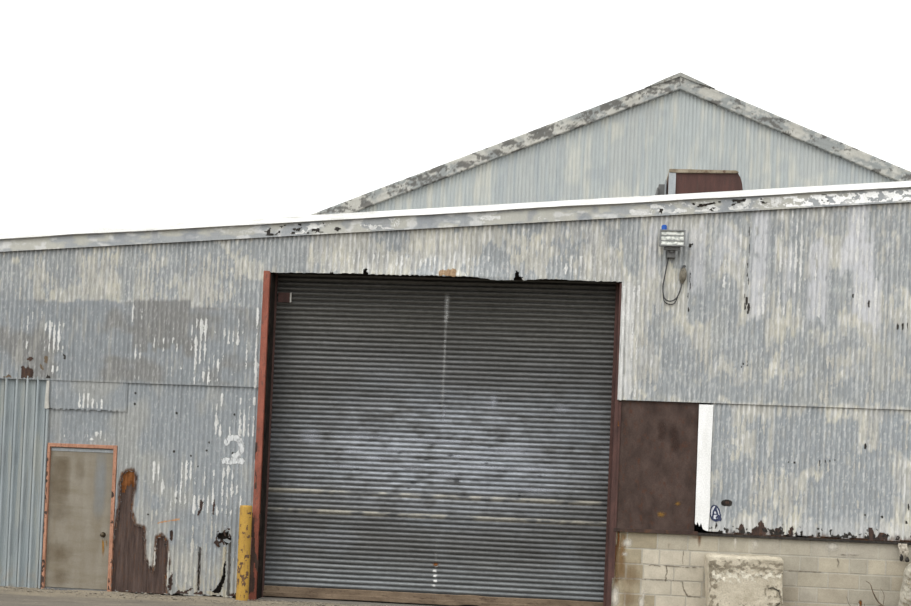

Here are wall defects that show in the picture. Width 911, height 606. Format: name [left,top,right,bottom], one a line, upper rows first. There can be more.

peeling [290,223,331,234]
peeling [625,190,911,406]
rust [6,356,50,378]
rust [102,468,211,595]
rust [738,520,794,537]
rust [868,528,888,541]
crack [768,554,852,606]